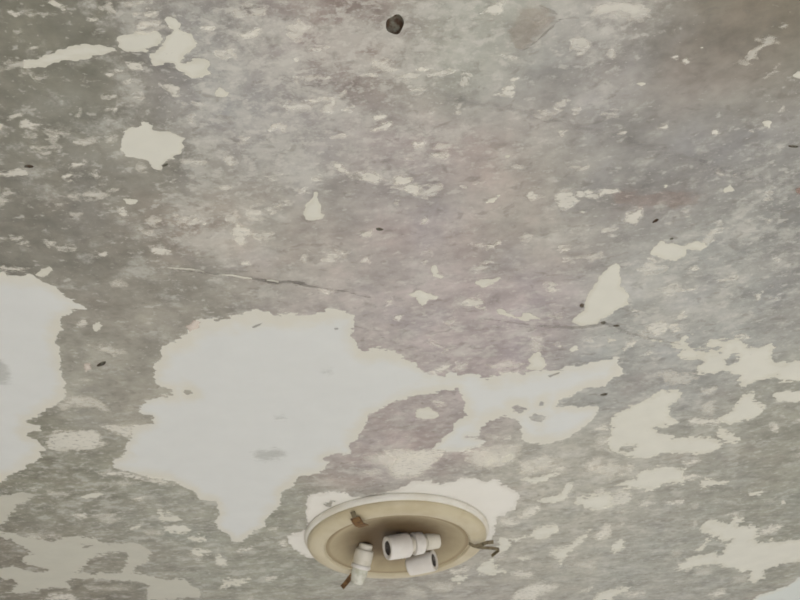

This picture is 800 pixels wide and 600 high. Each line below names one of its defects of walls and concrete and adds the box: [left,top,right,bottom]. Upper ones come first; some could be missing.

peeling [0,0,235,85]
peeling [159,83,203,123]
peeling [371,115,392,132]
peeling [107,122,205,173]
peeling [117,198,138,216]
peeling [225,204,289,245]
peeling [300,187,325,220]
peeling [602,207,644,232]
peeling [636,220,723,276]
crack [167,267,370,298]
peeling [0,261,800,600]